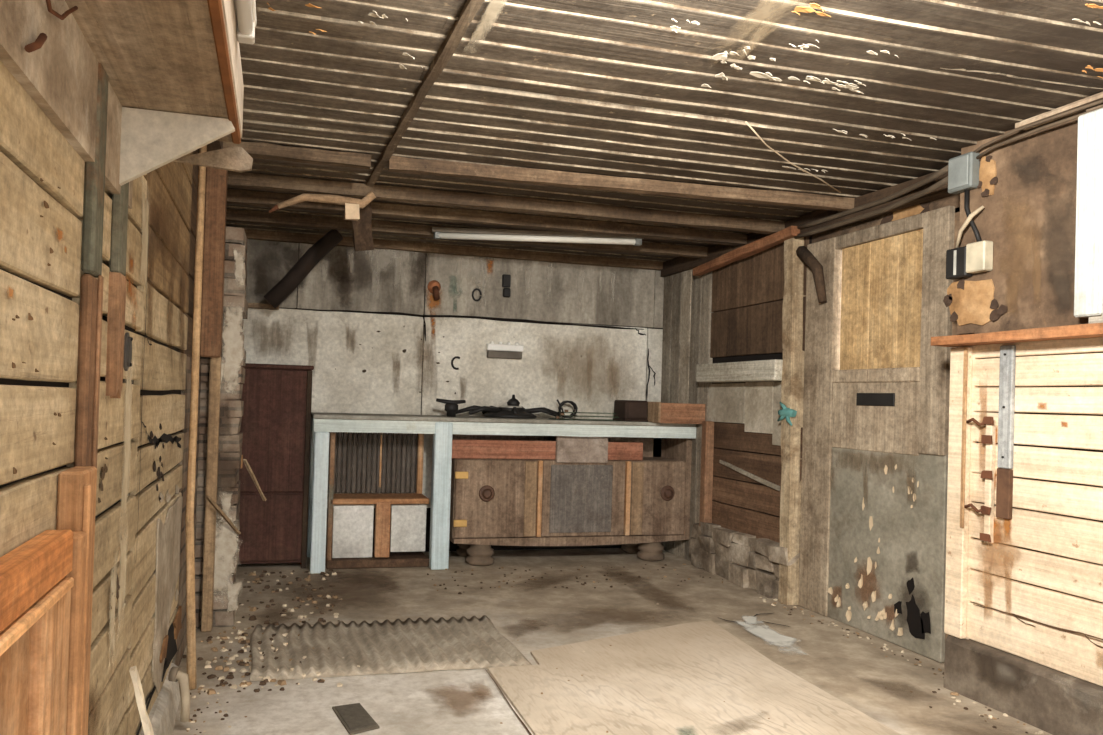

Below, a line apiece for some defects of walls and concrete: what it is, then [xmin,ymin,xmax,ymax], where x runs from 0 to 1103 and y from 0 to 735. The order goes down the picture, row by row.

peeling [792,3,831,17]
peeling [701,47,866,94]
leakage [329,247,380,300]
crack [136,269,181,553]
rust [993,519,1011,539]